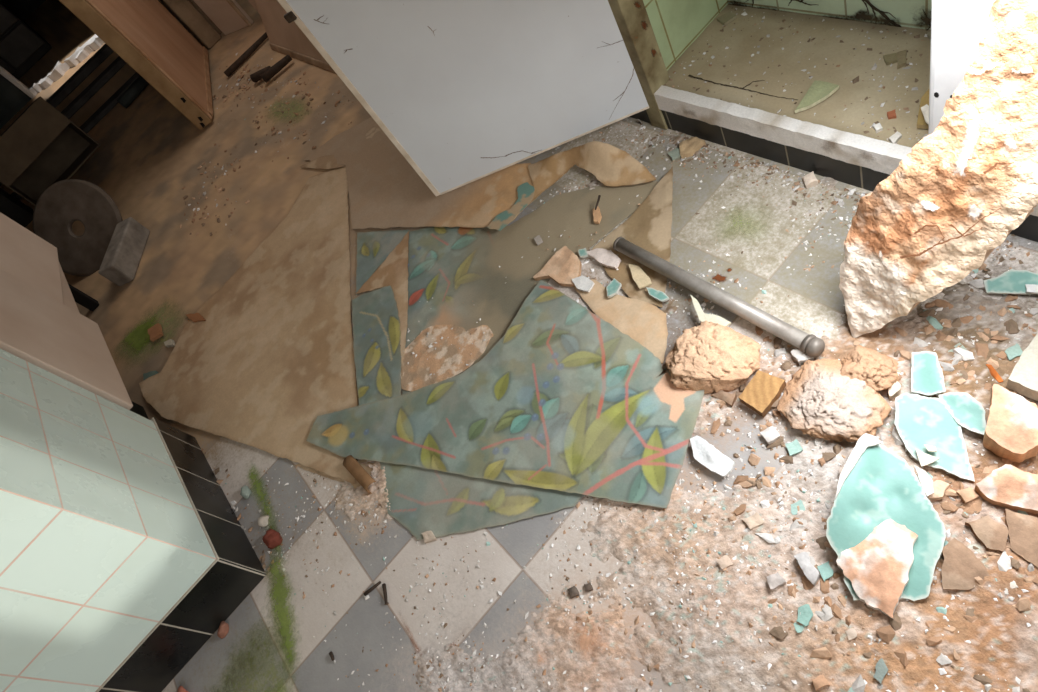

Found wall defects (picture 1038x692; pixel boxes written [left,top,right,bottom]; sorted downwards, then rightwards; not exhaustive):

peeling [883,49,907,69]
crack [688,74,797,100]
peeling [487,182,535,231]
spalling [593,206,602,224]
spalling [572,275,594,292]
spalling [578,248,669,302]
peeling [983,269,1038,295]